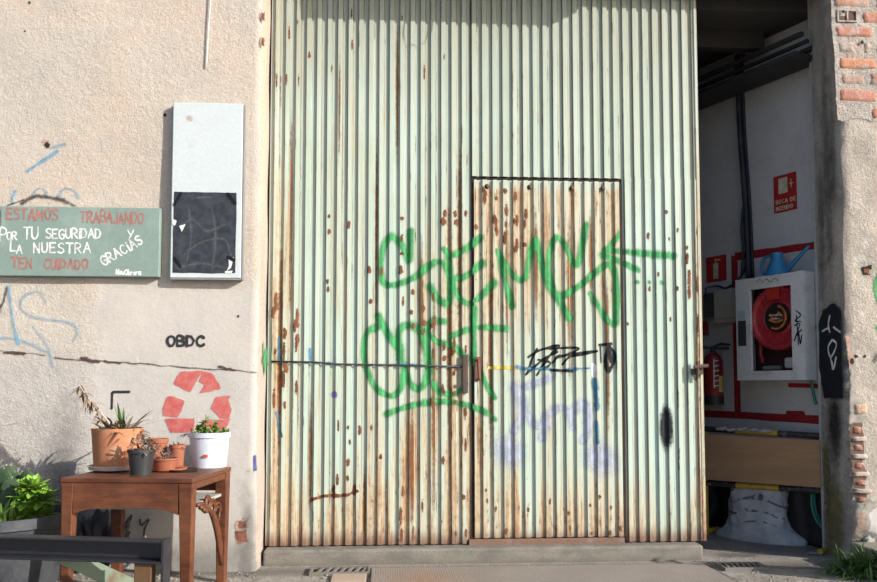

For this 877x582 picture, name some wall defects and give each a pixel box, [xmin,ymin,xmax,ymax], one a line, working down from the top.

peeling [830,0,877,122]
crack [0,350,257,373]
corrosion [271,132,300,446]
corrosion [367,155,383,325]
corrosion [402,170,468,490]
corrosion [482,186,538,306]
corrosion [676,246,699,299]
corrosion [308,416,366,531]
corrosion [399,410,424,542]
damp [823,446,843,556]
spalling [846,336,877,542]